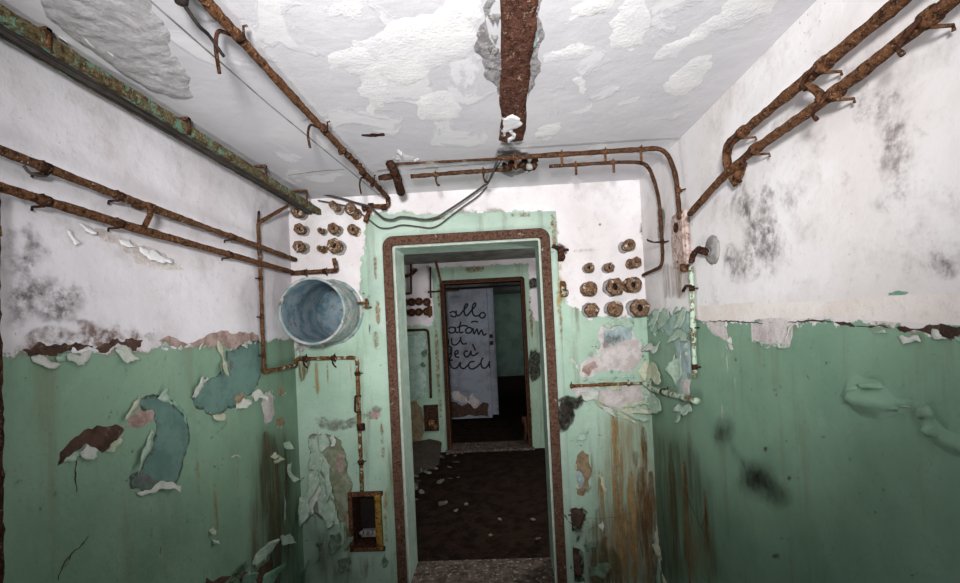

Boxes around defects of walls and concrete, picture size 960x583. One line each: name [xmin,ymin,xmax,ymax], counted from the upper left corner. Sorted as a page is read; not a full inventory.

peeling [322,0,502,116]
peeling [67,223,173,264]
damp [751,202,775,256]
flaking render [23,338,143,369]
peeling [569,307,734,424]
peeling [751,318,793,349]
flaking render [832,321,960,345]
peeling [57,330,287,496]
peeling [271,432,353,583]
rust [598,416,657,583]
peeling [206,534,296,583]
peeling [570,541,612,580]